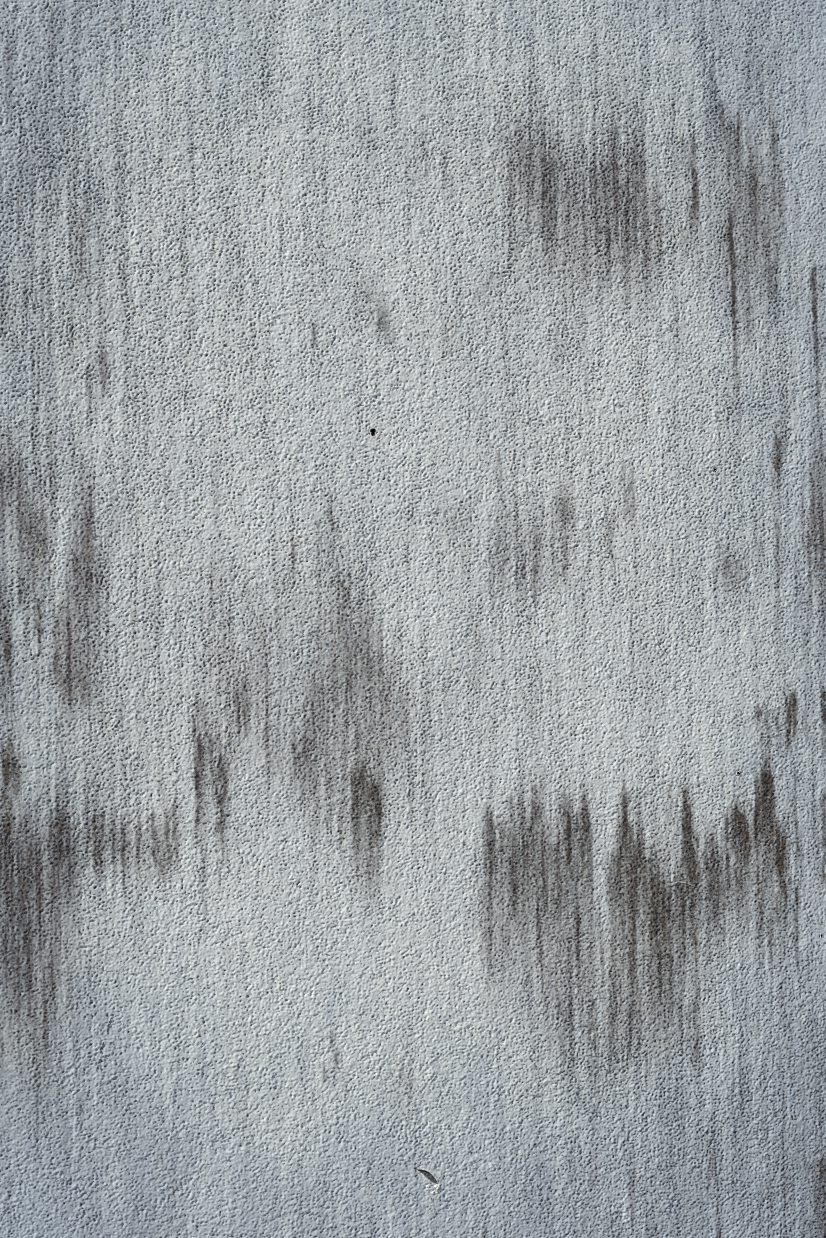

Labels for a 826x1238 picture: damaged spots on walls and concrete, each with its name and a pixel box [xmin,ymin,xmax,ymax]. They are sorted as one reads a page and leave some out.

leakage [519,137,570,233]
leakage [590,160,645,259]
leakage [727,124,783,340]
leakage [807,451,826,578]
leakage [293,591,390,767]
leakage [2,740,19,801]
leakage [193,719,226,839]
leakage [351,766,382,857]
leakage [0,805,176,1046]
leakage [482,793,592,997]
leakage [608,761,800,1022]